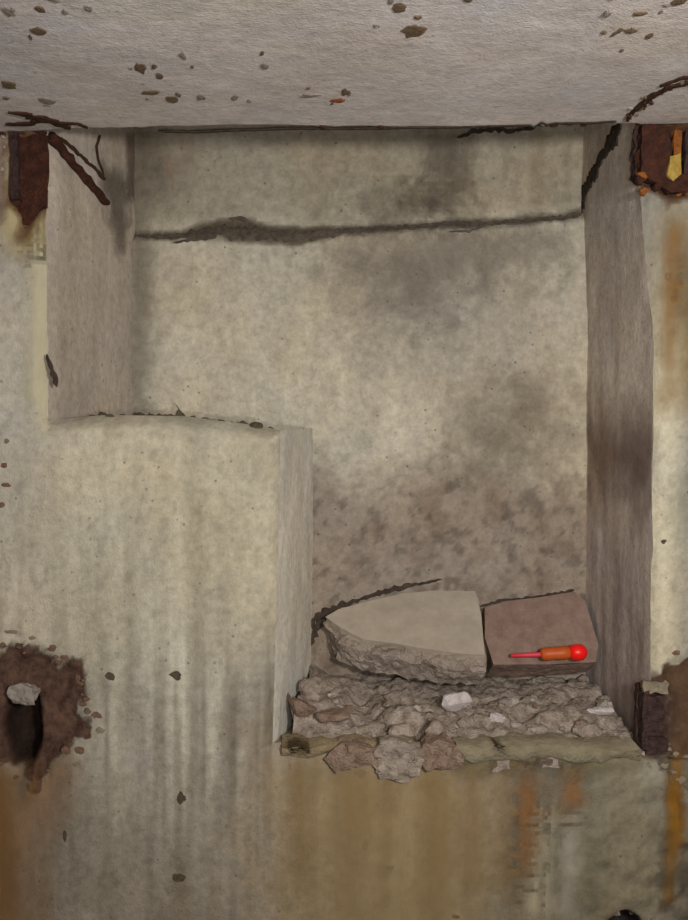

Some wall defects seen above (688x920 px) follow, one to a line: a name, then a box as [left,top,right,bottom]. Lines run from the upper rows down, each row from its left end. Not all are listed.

peeling [28,27,47,41]
peeling [388,0,427,38]
peeling [601,0,687,39]
peeling [129,63,163,80]
peeling [141,90,181,103]
peeling [300,87,351,105]
rust [2,131,110,247]
crack [134,76,688,245]
rust [629,123,688,202]
crack [311,578,442,645]
spalling [0,630,105,793]
spalling [656,650,688,789]